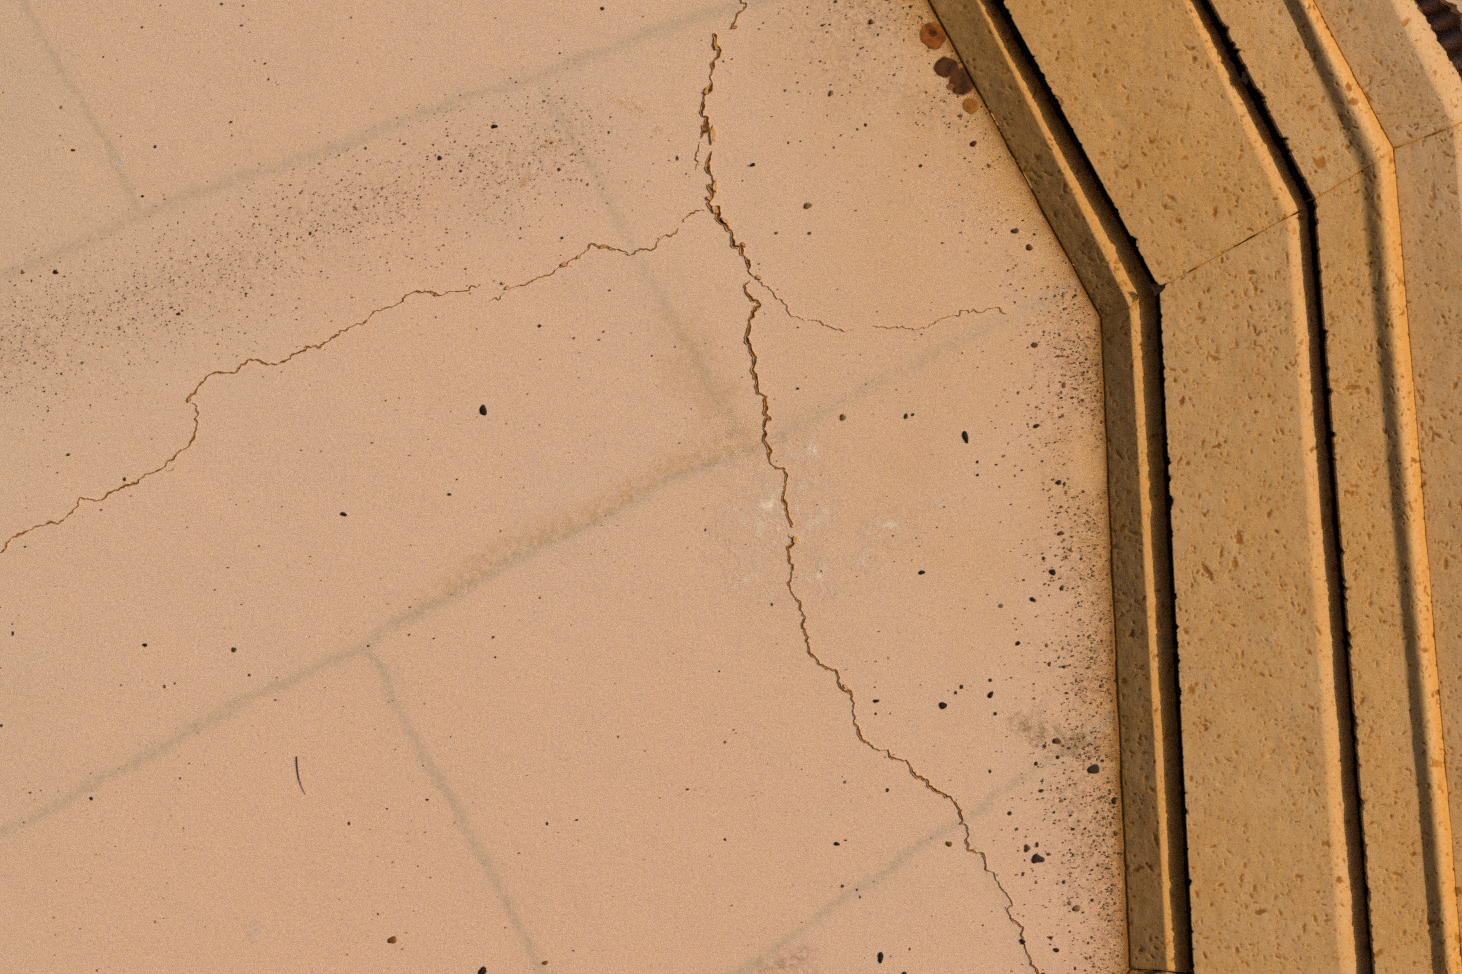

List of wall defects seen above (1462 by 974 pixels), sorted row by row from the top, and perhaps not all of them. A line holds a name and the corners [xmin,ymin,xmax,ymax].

crack [0,0,1039,974]
water stain [759,1,937,105]
water stain [909,50,1127,974]
corrosion [921,0,1133,974]